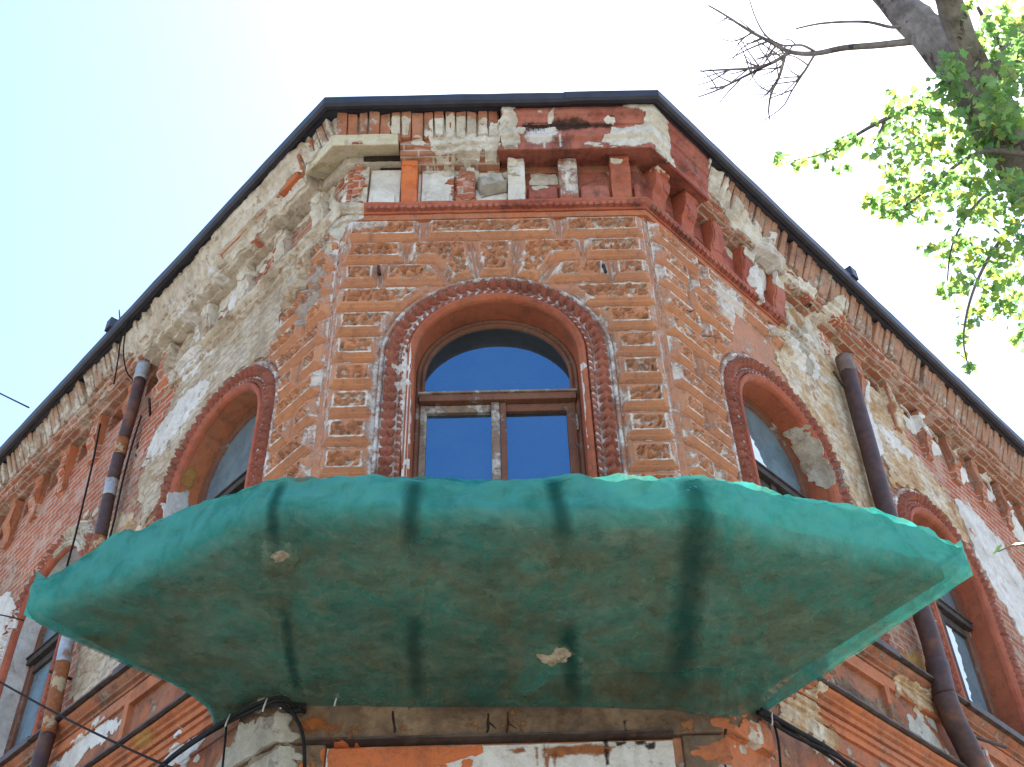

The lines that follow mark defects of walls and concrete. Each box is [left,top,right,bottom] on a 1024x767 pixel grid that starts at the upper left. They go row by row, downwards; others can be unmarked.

flaking render [293,140,317,179]
peeling [387,107,558,201]
peeling [584,104,676,178]
peeling [199,164,367,318]
peeling [708,159,849,384]
flaking render [0,398,129,575]
flaking render [133,347,187,470]
peeling [782,424,841,489]
flaking render [863,372,1024,566]
peeling [51,716,121,767]
peeling [734,669,955,765]